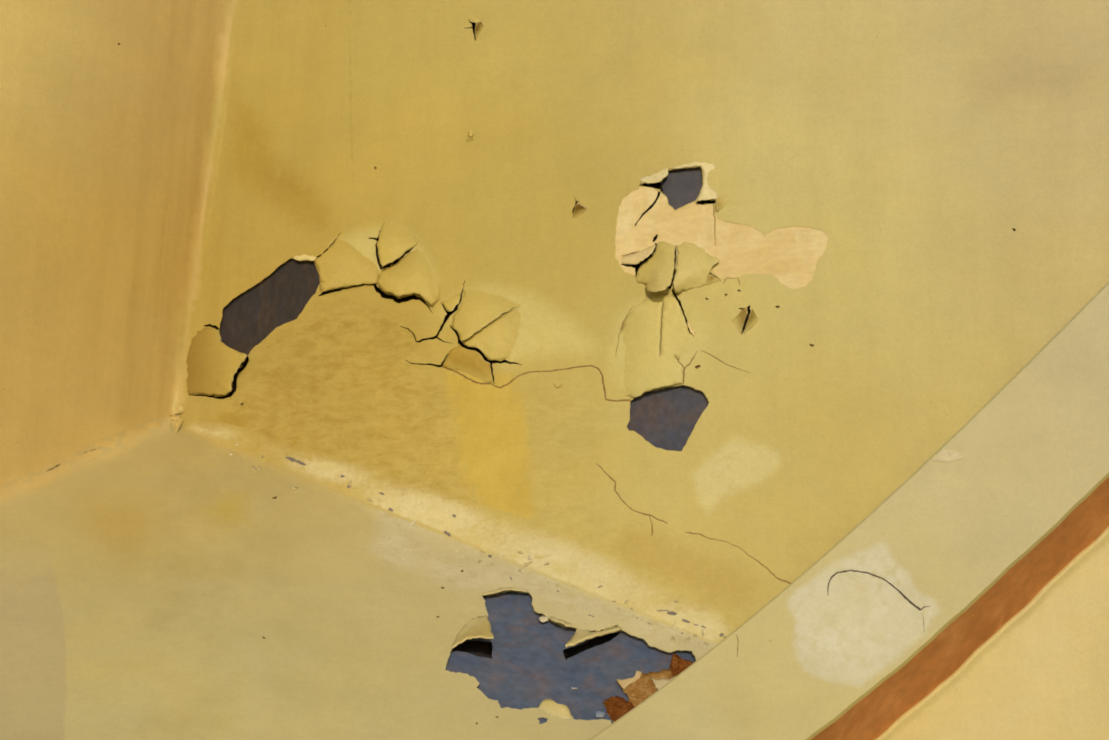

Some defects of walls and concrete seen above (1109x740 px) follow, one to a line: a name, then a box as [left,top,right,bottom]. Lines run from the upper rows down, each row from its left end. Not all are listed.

peeling [293,162,829,398]
crack [400,281,631,402]
crack [659,306,750,382]
crack [596,463,791,584]
crack [827,570,930,627]
peeling [596,653,694,722]